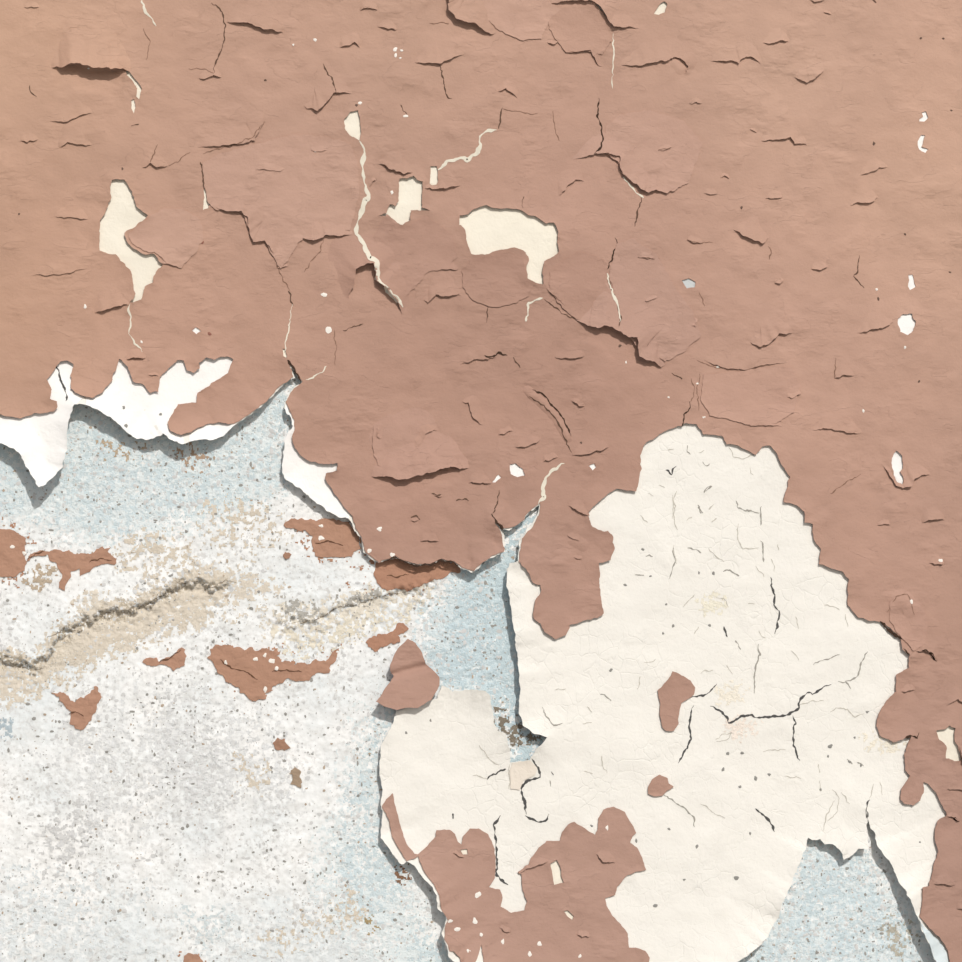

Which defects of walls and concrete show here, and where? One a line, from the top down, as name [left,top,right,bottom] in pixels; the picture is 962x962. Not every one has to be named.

crack [438,109,559,170]
peeling [54,110,559,315]
crack [354,141,403,307]
crack [276,241,362,381]
peeling [0,356,235,487]
peeling [282,404,349,519]
crack [529,390,571,504]
crack [294,556,458,623]
crack [635,360,882,832]
peeling [371,423,962,962]
crack [473,745,554,823]
crack [493,815,508,885]